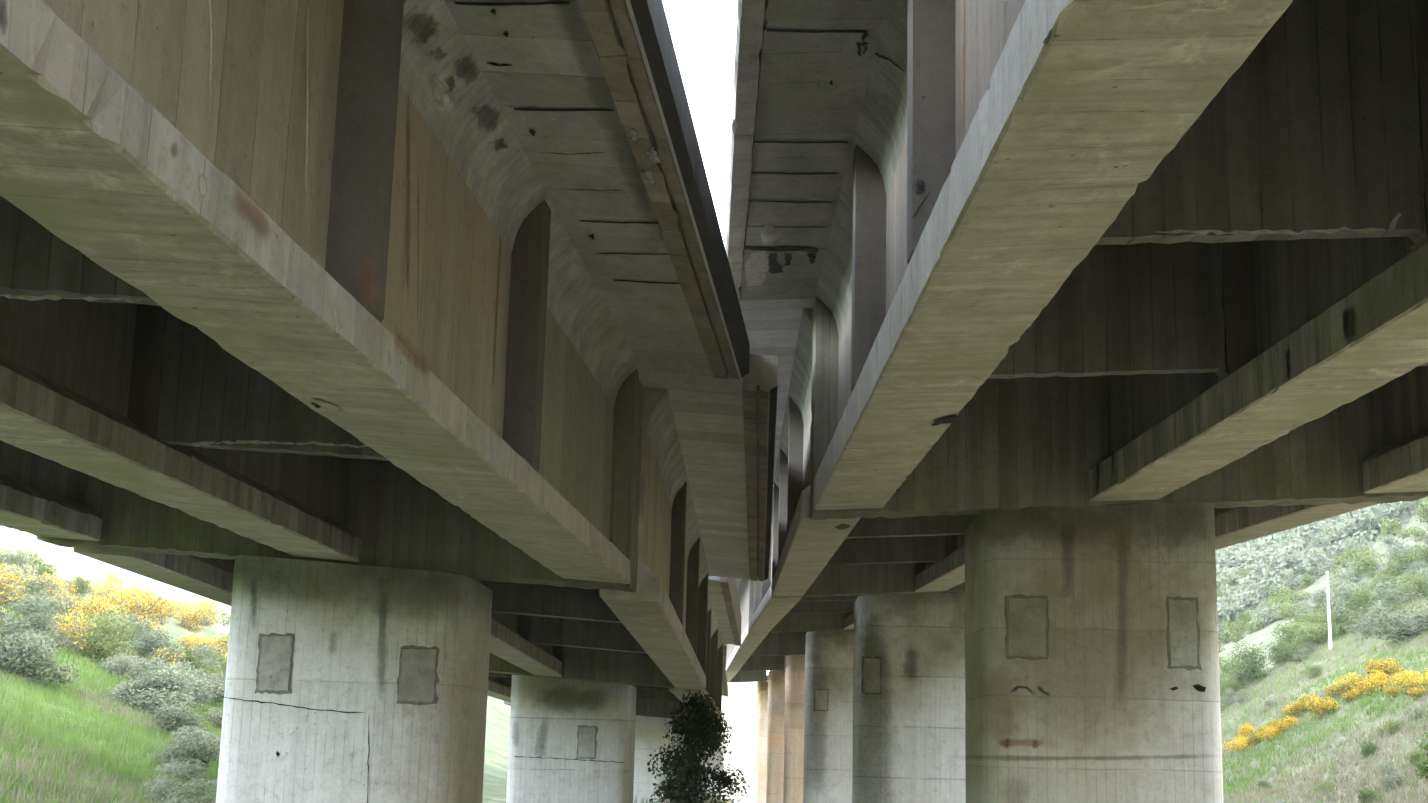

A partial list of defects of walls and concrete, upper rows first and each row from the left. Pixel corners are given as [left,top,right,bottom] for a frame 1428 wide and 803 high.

crack [486,60,513,68]
crack [875,52,903,71]
spalling [743,246,819,287]